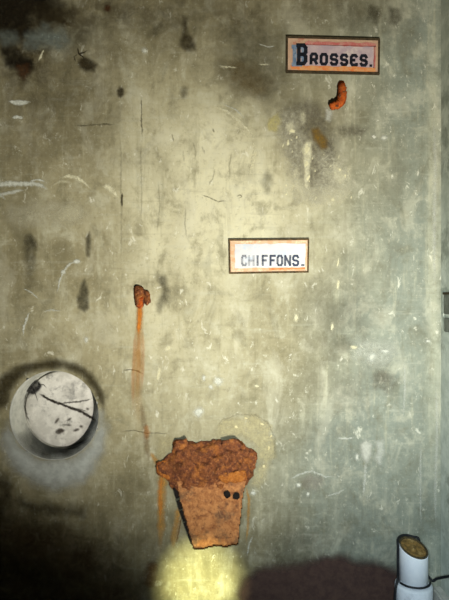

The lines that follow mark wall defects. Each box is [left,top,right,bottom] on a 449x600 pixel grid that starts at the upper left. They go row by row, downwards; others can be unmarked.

leakage [0,0,63,79]
leakage [181,34,194,49]
leakage [78,283,88,311]
rust [172,488,192,544]